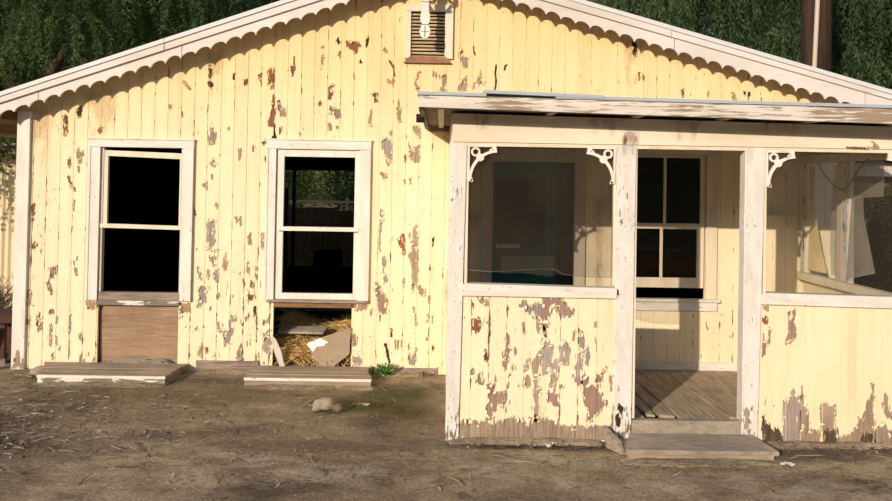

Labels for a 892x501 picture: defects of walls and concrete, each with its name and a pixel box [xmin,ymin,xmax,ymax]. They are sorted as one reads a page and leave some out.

peeling [335,35,370,64]
peeling [63,104,83,137]
peeling [231,68,287,135]
peeling [380,99,421,180]
peeling [26,288,83,362]
peeling [178,209,228,314]
peeling [197,261,272,361]
peeling [352,209,388,322]
peeling [397,224,434,326]
peeling [785,308,797,345]
peeling [459,297,624,441]
peeling [782,380,892,442]